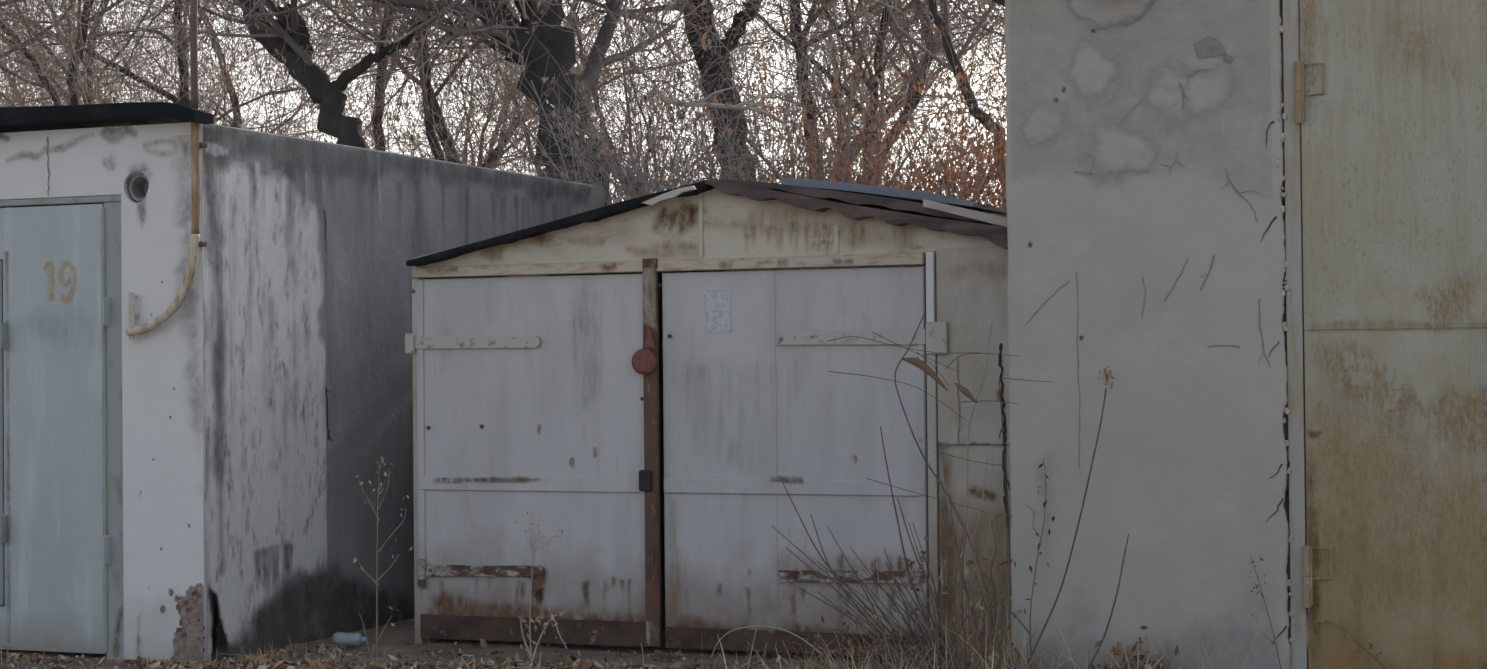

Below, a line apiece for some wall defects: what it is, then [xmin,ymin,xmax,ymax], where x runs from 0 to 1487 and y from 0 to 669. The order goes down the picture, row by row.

leakage [203,124,259,281]
leakage [215,309,224,480]
peeling [160,158,327,663]
rust [1320,347,1487,446]
leakage [219,569,415,660]
rust [434,573,643,622]